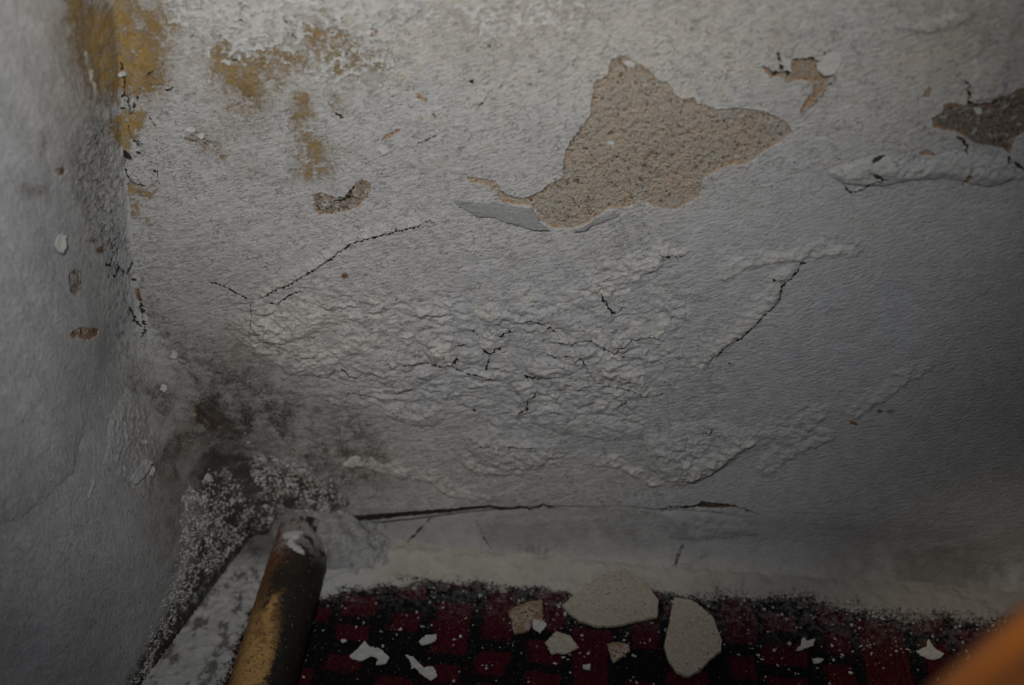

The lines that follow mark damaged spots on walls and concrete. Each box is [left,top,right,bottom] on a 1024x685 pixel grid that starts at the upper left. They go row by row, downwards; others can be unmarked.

peeling [311,178,373,217]
peeling [454,50,842,232]
peeling [844,153,889,193]
peeling [918,81,1024,170]
crack [210,212,442,341]
crack [659,246,691,258]
crack [704,262,806,366]
crack [341,293,669,450]
damp [128,352,381,685]
crack [340,503,553,546]
crack [660,501,753,512]